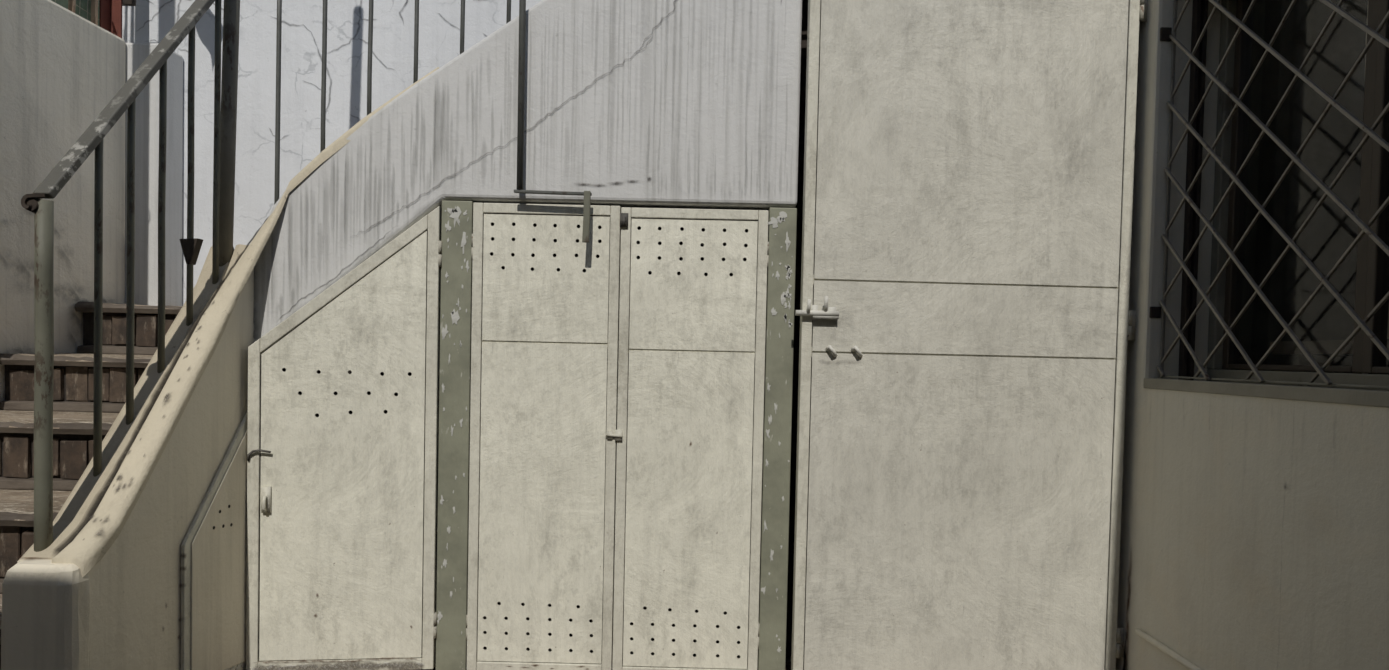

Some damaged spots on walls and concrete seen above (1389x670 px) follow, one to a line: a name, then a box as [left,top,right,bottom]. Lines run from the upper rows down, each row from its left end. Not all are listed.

peeling [442,206,469,362]
peeling [767,211,793,338]
peeling [440,473,465,597]